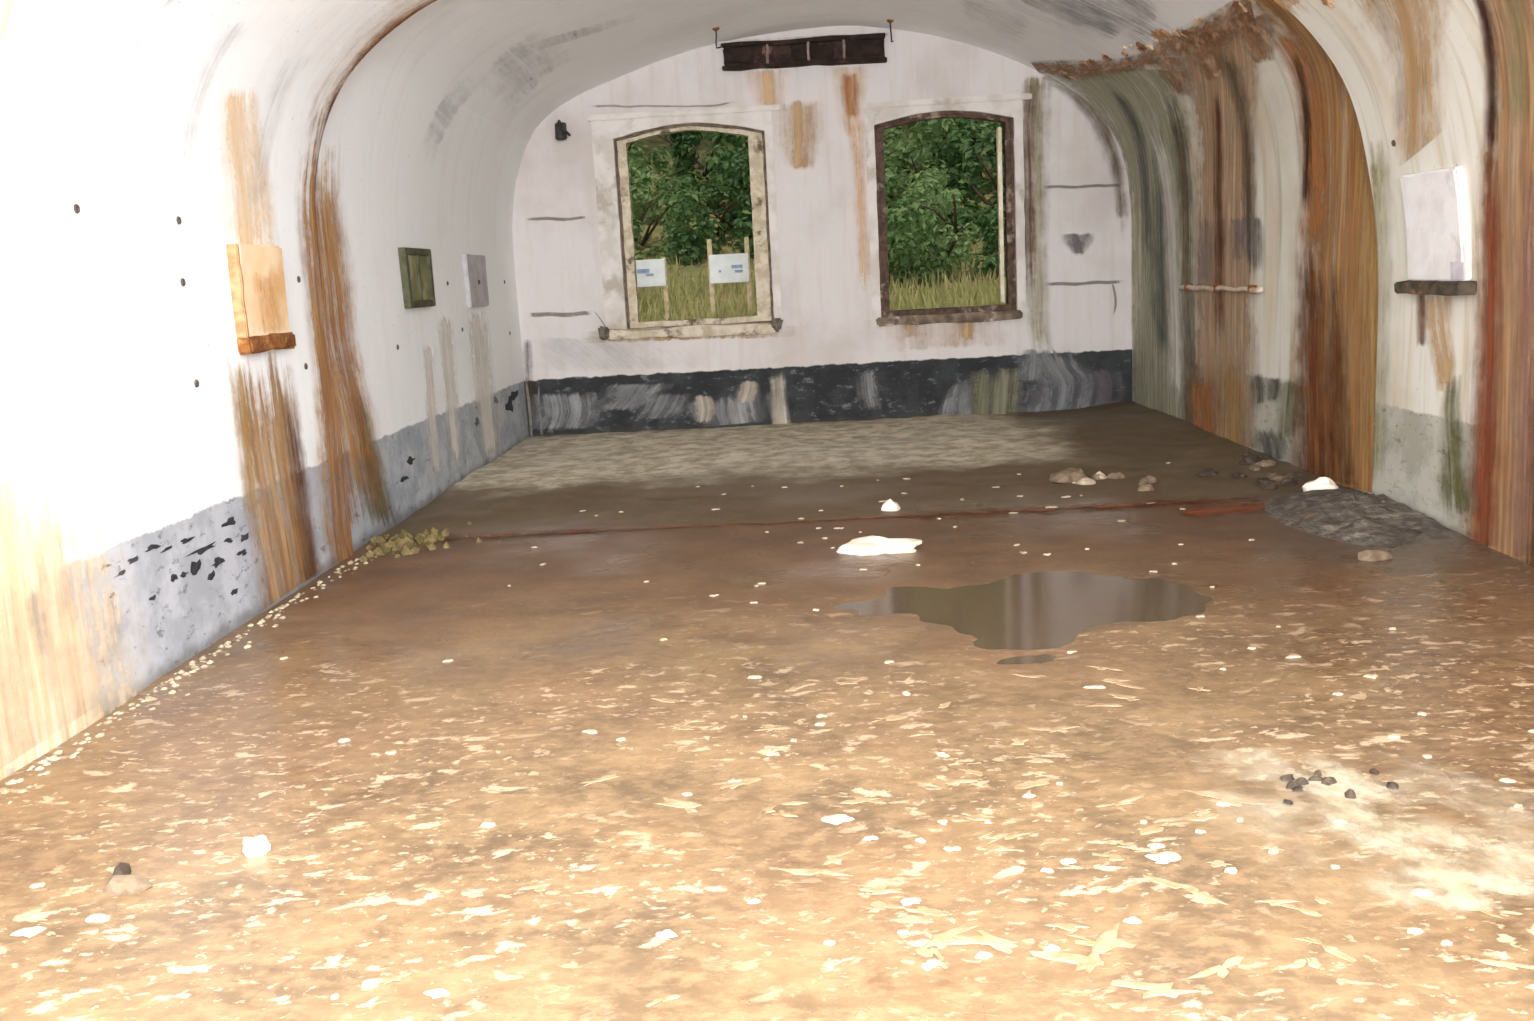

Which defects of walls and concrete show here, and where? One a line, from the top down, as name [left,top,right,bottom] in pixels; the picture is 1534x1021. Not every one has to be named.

rust [845,76,856,129]
water stain [1050,77,1123,217]
rust [1368,0,1436,159]
rust [238,89,394,604]
water stain [425,318,460,474]
water stain [473,316,497,458]
water stain [1068,234,1090,253]
water stain [1114,93,1181,399]
rust [1031,0,1382,493]
water stain [1255,376,1293,459]
rust [1418,0,1534,567]
rust [0,457,125,781]